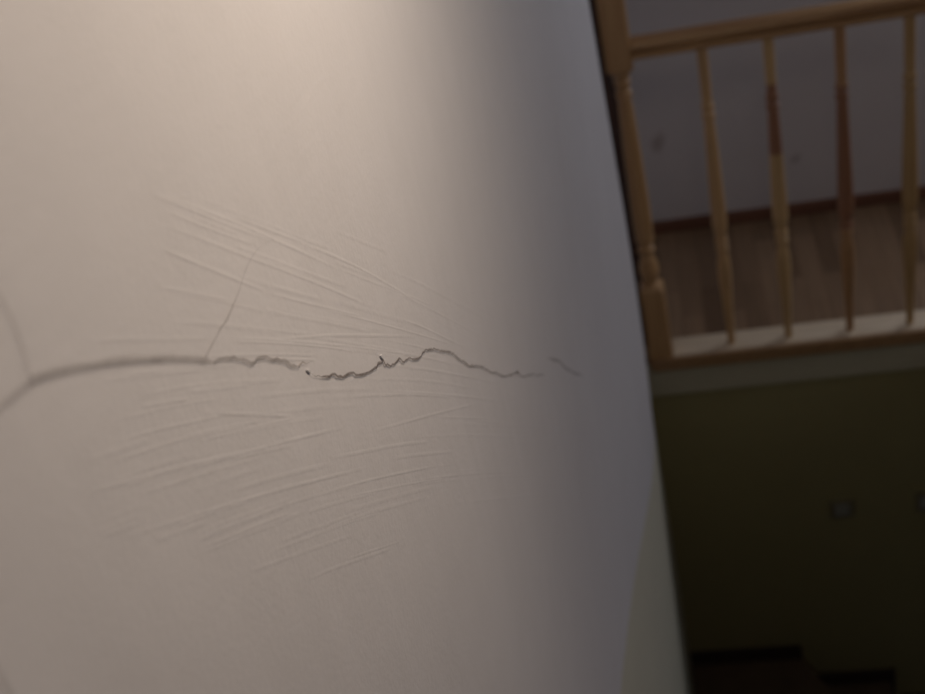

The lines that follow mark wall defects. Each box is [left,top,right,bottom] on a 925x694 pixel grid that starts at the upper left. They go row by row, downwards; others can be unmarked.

crack [306,348,518,378]